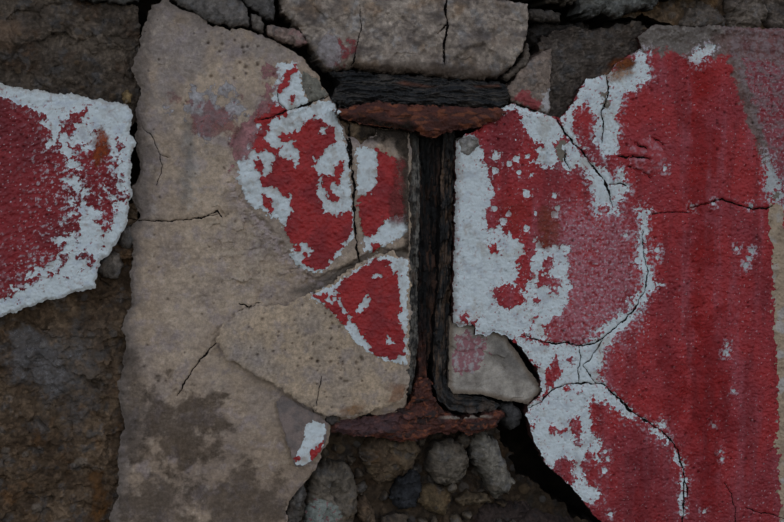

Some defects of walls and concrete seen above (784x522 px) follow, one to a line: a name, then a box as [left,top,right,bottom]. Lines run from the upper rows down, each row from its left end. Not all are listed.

crack [437,0,449,65]
spalling [0,0,141,522]
peeling [235,60,410,366]
crack [346,123,362,264]
peeling [452,0,727,516]
crack [601,74,609,141]
crack [556,118,663,207]
crack [653,198,771,214]
crack [177,343,216,396]
crack [523,231,688,522]
peeling [761,154,784,522]
spalling [293,420,589,522]